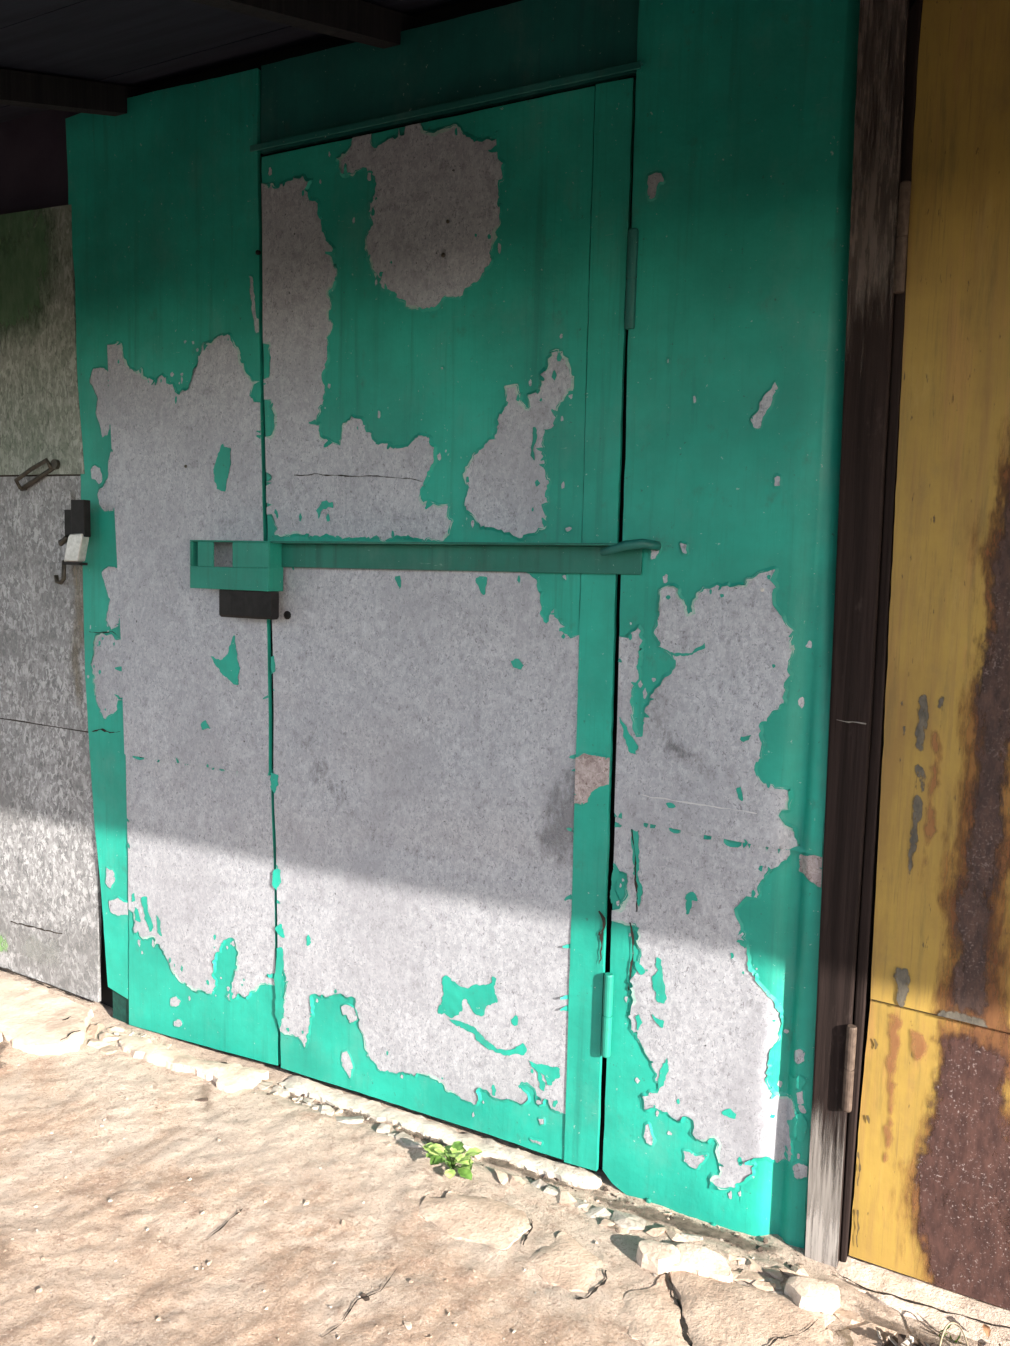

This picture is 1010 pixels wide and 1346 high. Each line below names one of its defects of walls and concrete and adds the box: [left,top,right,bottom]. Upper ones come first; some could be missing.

peeling [328,123,506,313]
peeling [87,167,823,1199]
peeling [901,695,944,874]
corrosion [884,458,1010,1310]
peeling [893,967,911,1007]
peeling [938,1010,988,1028]
crack [664,1272,693,1346]
crack [768,1319,818,1346]